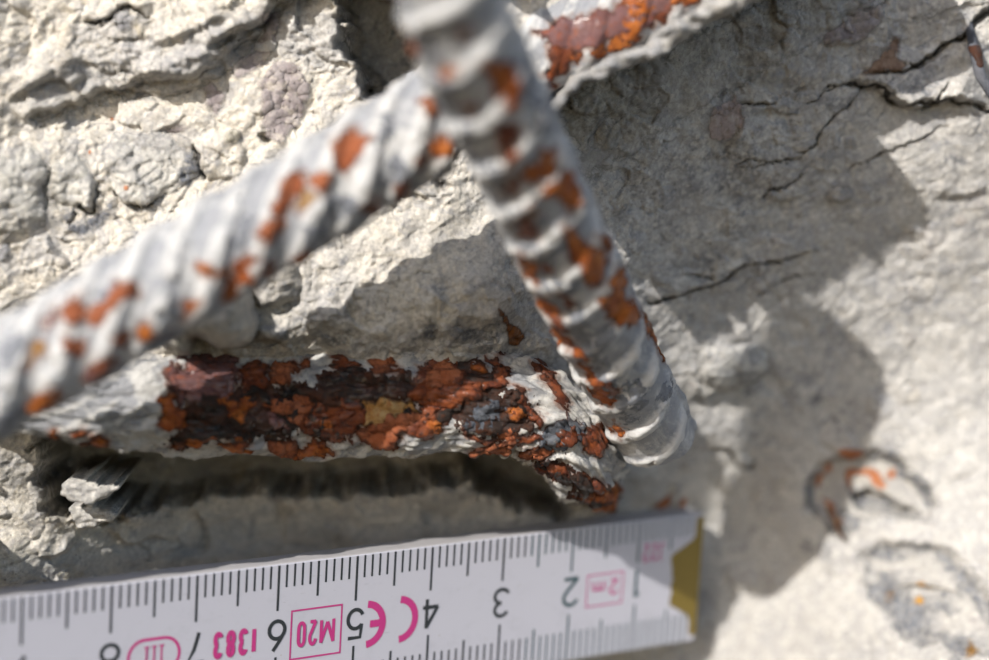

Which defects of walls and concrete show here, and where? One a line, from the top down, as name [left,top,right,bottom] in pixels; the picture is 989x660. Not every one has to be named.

crack [736,11,989,199]
spalling [0,0,874,519]
crack [648,250,817,305]
rust [498,308,525,346]
rust [815,463,846,541]
rust [838,449,895,491]